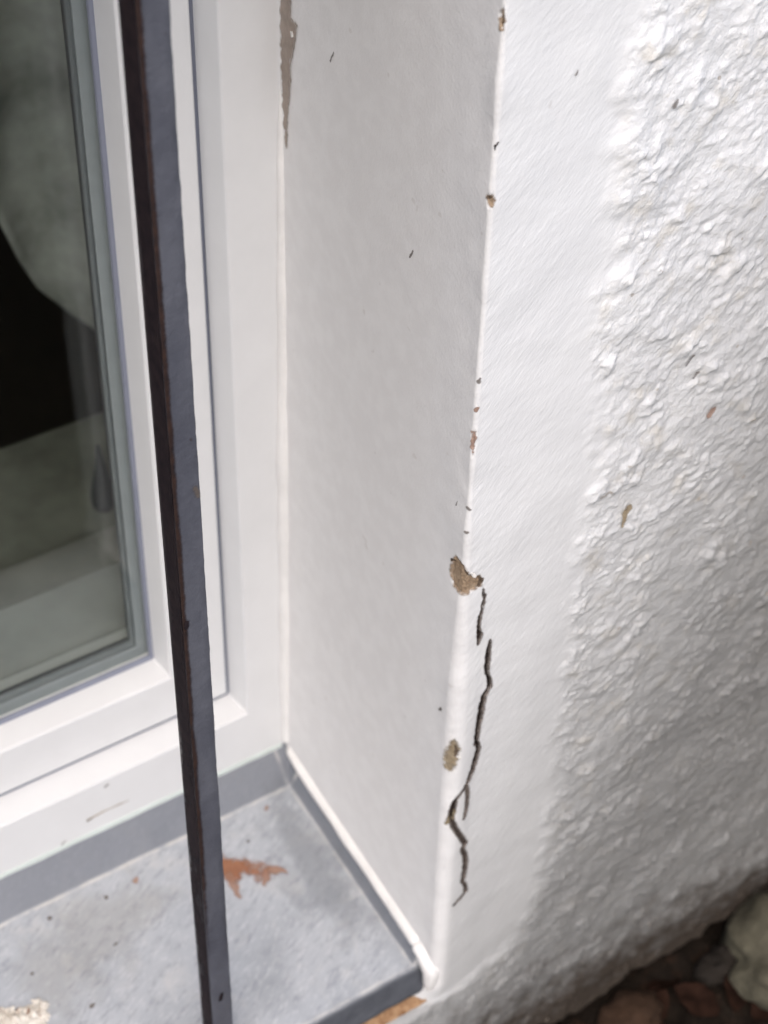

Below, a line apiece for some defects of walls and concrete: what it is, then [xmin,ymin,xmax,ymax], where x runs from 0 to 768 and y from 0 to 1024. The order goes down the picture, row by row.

flaking render [280,0,297,146]
flaking render [450,556,484,595]
flaking render [443,740,462,771]
crack [445,589,493,907]
rust [223,858,287,898]